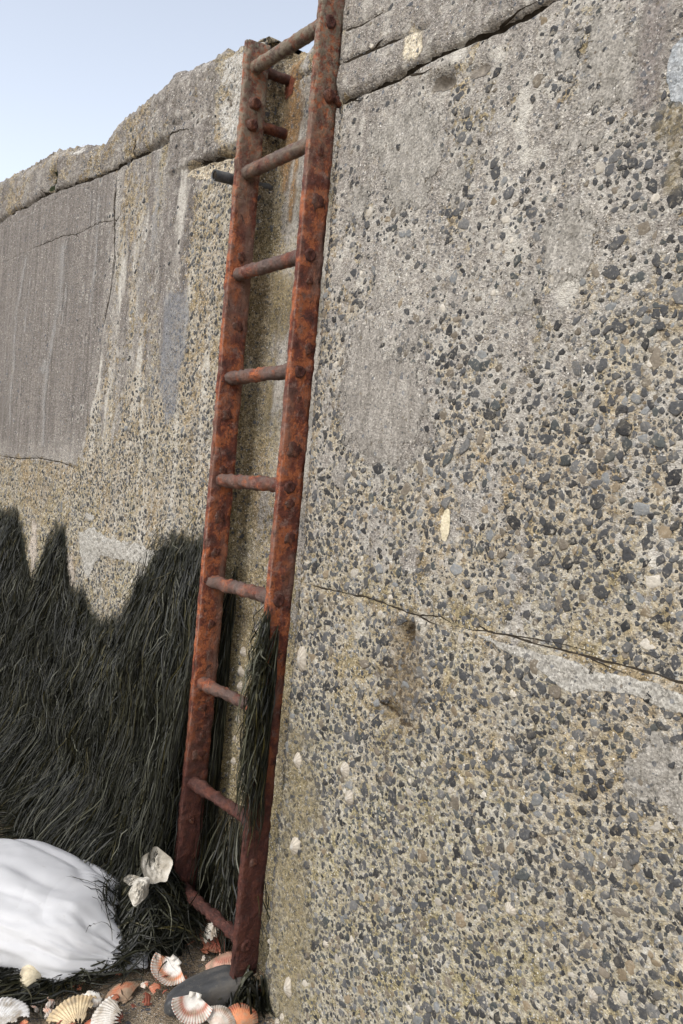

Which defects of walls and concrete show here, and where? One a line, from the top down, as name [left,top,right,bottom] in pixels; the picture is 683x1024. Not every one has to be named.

corrosion [282,61,302,145]
crack [341,0,549,105]
crack [12,128,187,326]
crack [306,584,683,684]